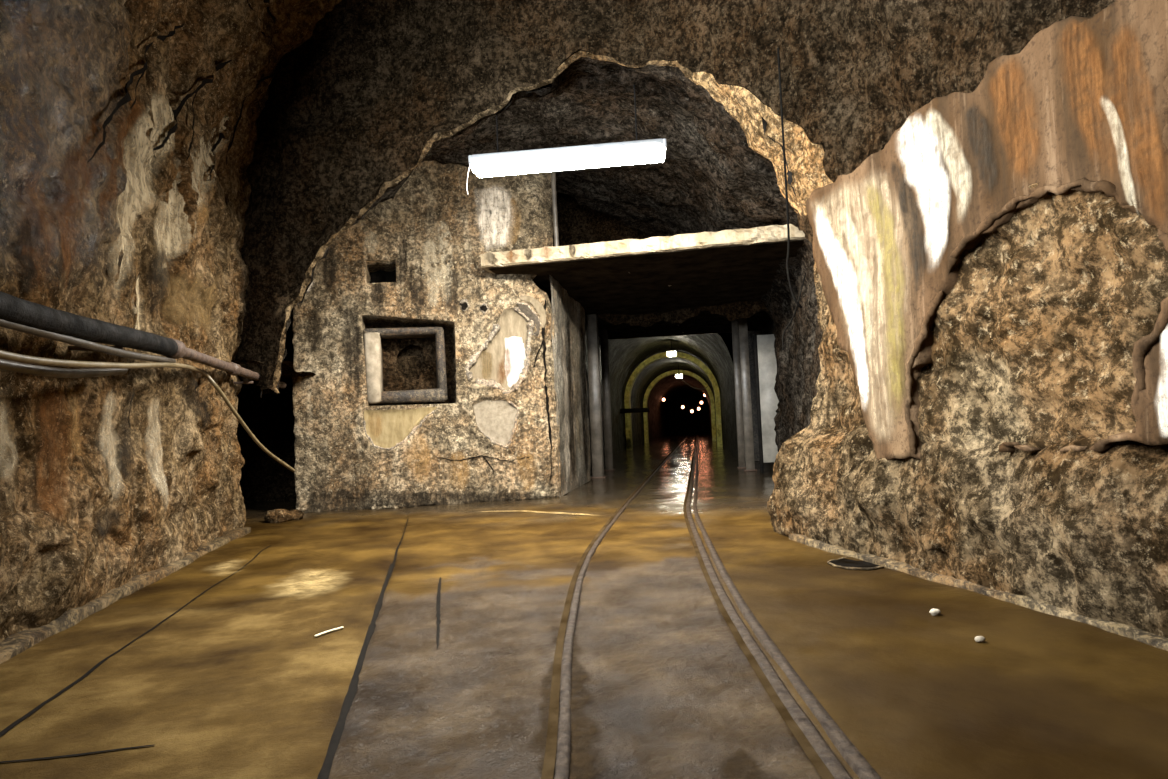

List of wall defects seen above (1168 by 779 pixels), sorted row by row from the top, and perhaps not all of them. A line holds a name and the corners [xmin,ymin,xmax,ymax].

flaking render [459,296,546,448]
spalling [904,178,1168,464]